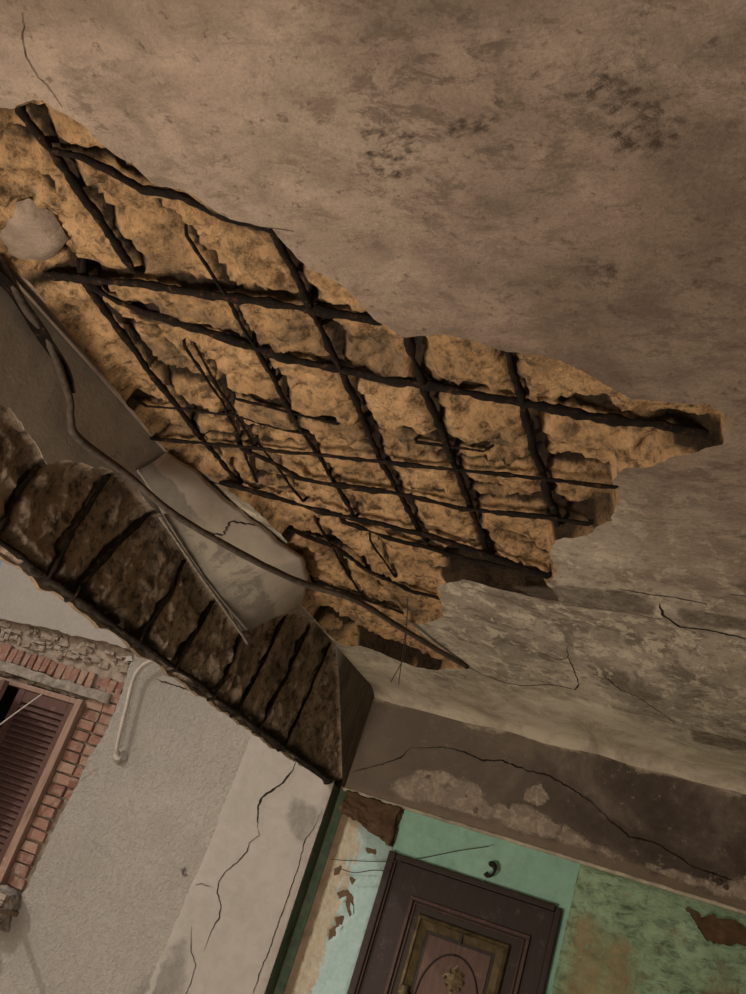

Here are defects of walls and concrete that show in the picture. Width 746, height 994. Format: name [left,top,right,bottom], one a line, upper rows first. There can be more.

spalling [0,100,728,892]
crack [566,589,746,641]
crack [186,762,298,994]
crack [253,810,322,993]
peeling [328,865,356,940]
crack [354,740,746,884]
peeling [647,864,746,900]
peeling [684,906,746,949]